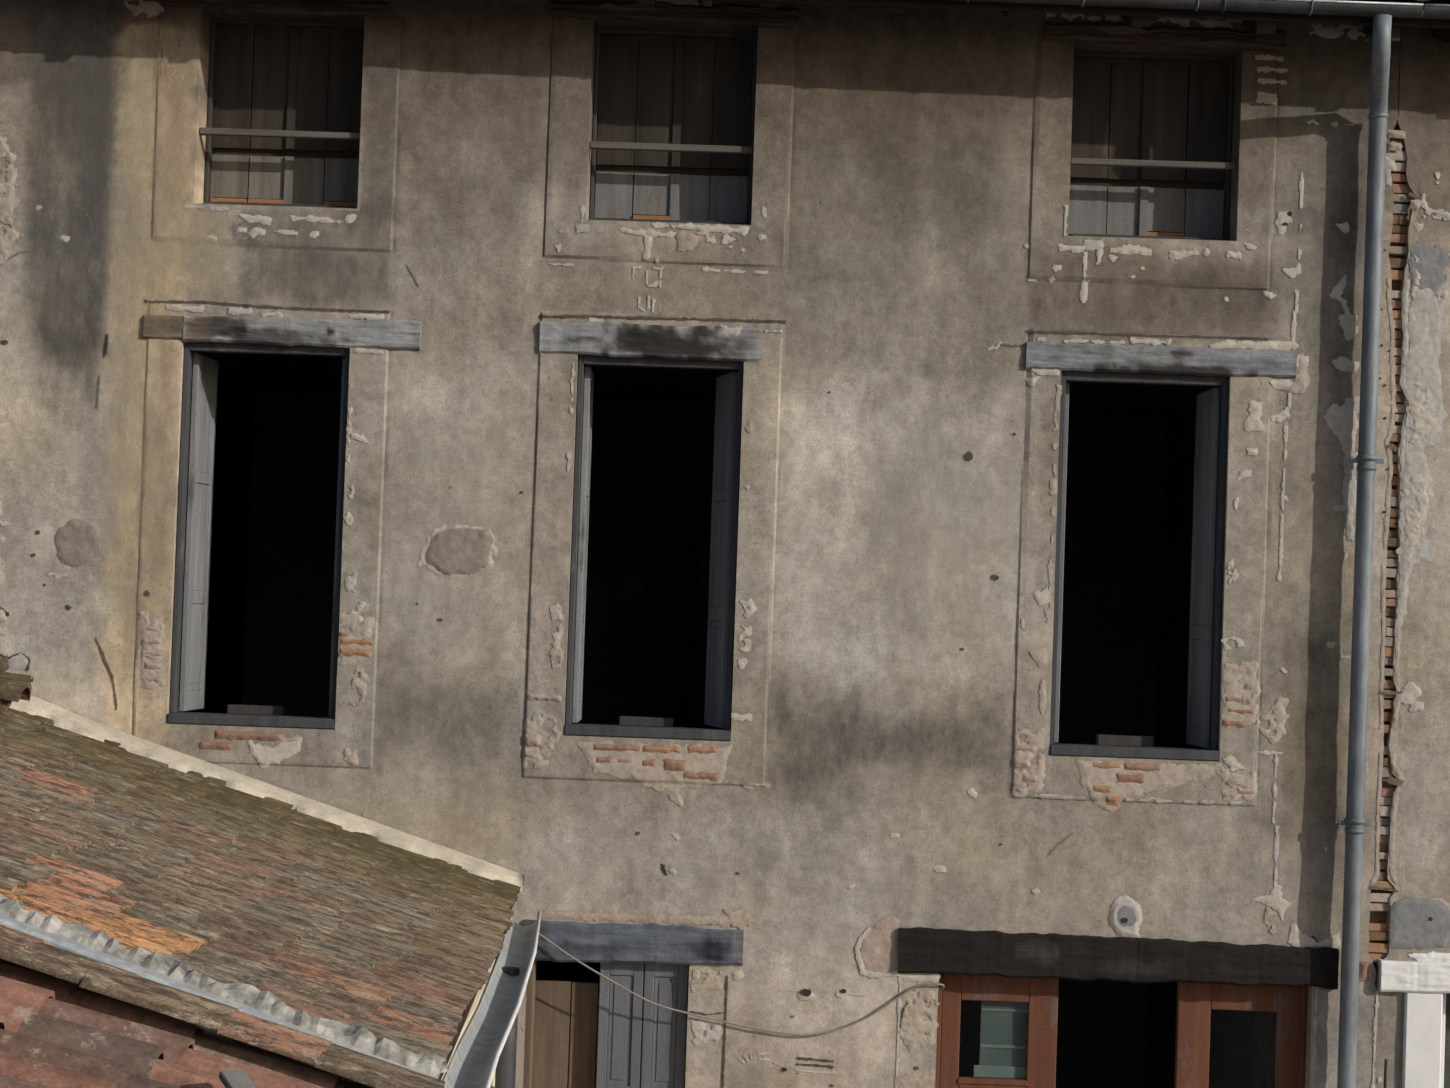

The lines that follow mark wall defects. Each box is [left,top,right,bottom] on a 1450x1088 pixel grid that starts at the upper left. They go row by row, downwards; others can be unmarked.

leakage [29,0,112,359]
flaking render [183,204,357,238]
flaking render [1027,205,1257,303]
peeling [426,527,493,575]
flaking render [1210,248,1310,581]
flaking render [1323,396,1360,561]
crack [1359,126,1422,981]
flaking render [1395,255,1449,632]
flaking render [200,730,302,768]
flaking render [522,694,732,807]
flaking render [1011,636,1342,948]
peeling [1389,897,1450,962]